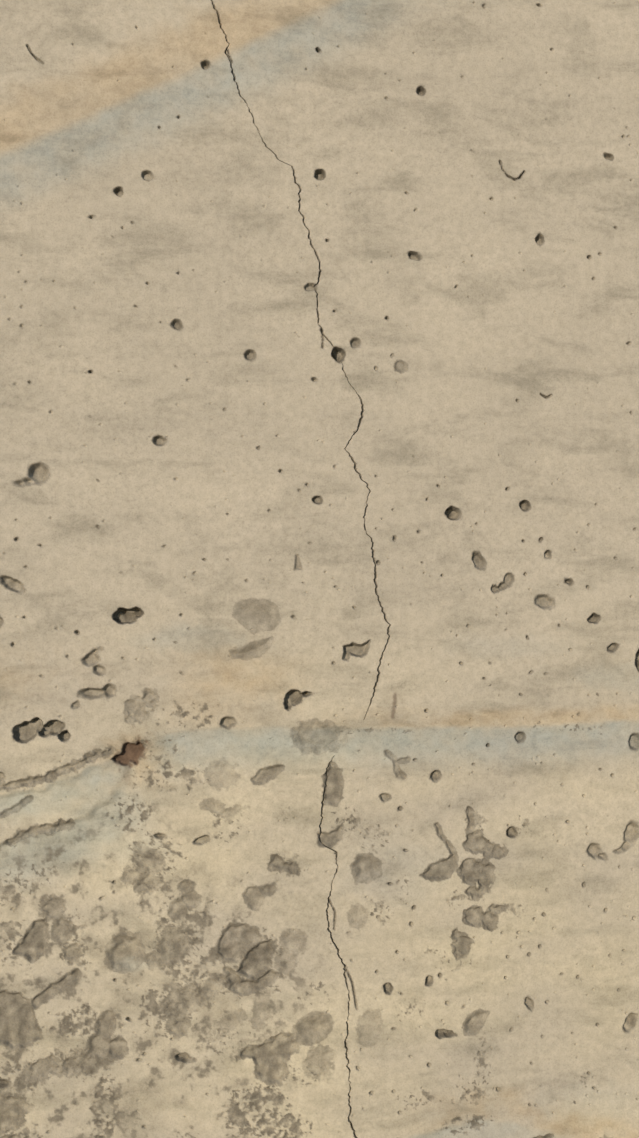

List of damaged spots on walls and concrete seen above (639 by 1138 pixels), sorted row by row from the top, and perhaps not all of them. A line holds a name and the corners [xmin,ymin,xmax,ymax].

crack [211,0,391,719]
spalling [288,718,393,885]
peeling [383,749,411,780]
spalling [0,687,340,1138]
crack [318,755,358,1138]
spalling [355,1008,384,1047]
spalling [346,805,538,971]
spalling [463,1008,490,1036]
spalling [427,1112,500,1138]